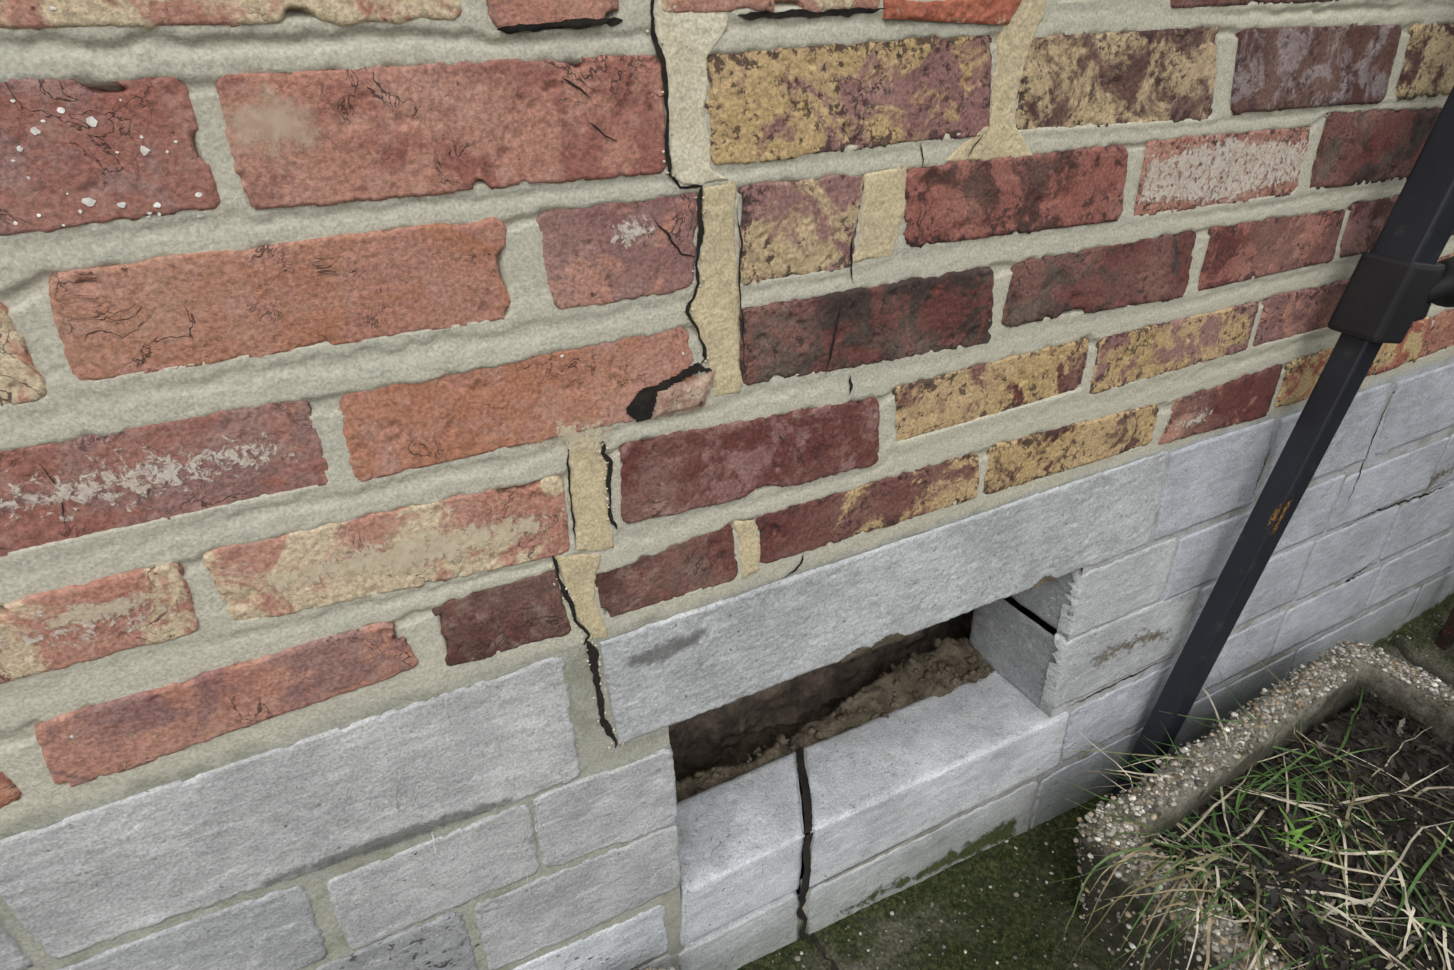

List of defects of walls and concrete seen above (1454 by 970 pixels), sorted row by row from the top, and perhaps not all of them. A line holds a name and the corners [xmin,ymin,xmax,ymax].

crack [563,78,617,142]
crack [646,0,745,372]
spalling [626,362,716,422]
damp [0,432,298,526]
crack [549,435,624,749]
spalling [1004,575,1057,636]
spalling [668,609,974,763]
crack [795,747,839,970]